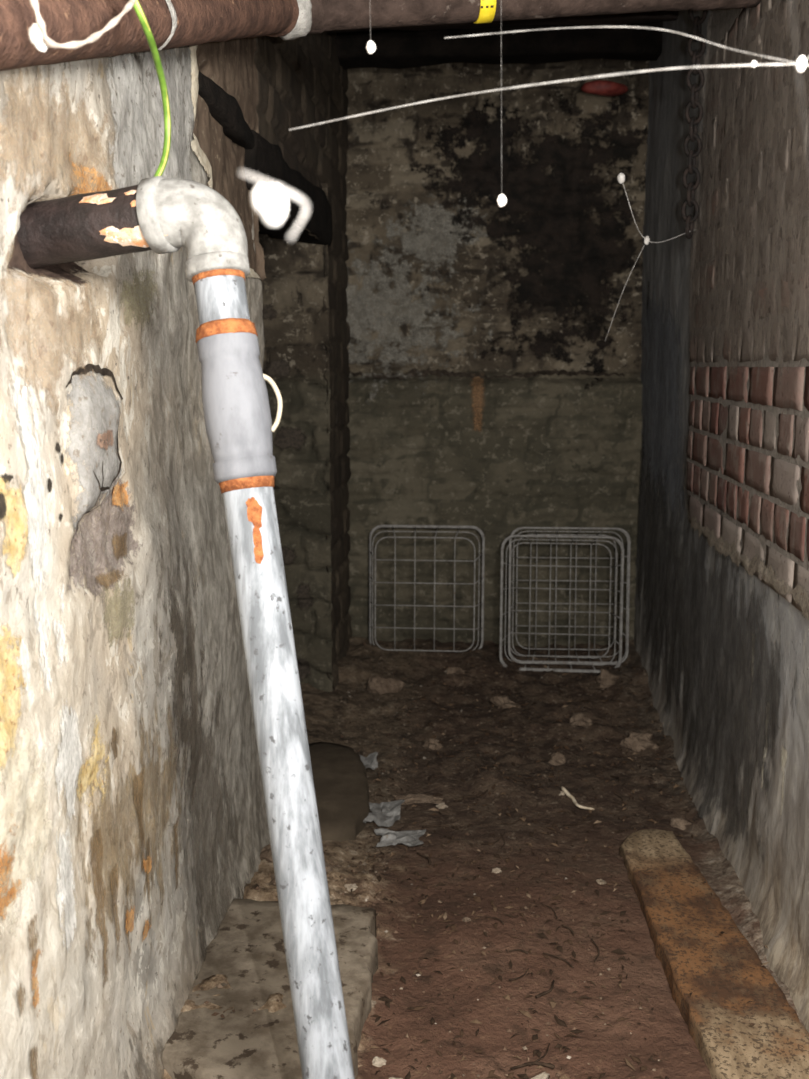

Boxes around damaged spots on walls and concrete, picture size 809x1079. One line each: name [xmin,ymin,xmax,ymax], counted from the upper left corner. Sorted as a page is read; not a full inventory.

flaking render [682,0,809,620]
spalling [67,479,140,601]
rust [0,829,22,919]